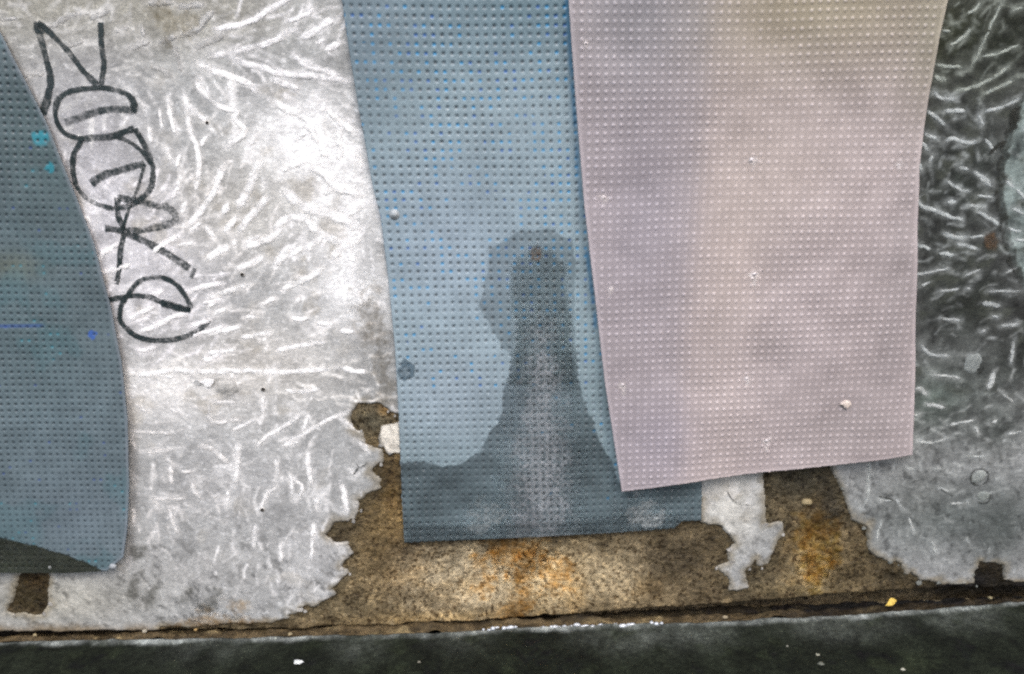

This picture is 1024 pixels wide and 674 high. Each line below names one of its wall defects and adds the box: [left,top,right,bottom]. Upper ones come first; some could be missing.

leakage [398,359,414,380]
spalling [160,403,1024,630]